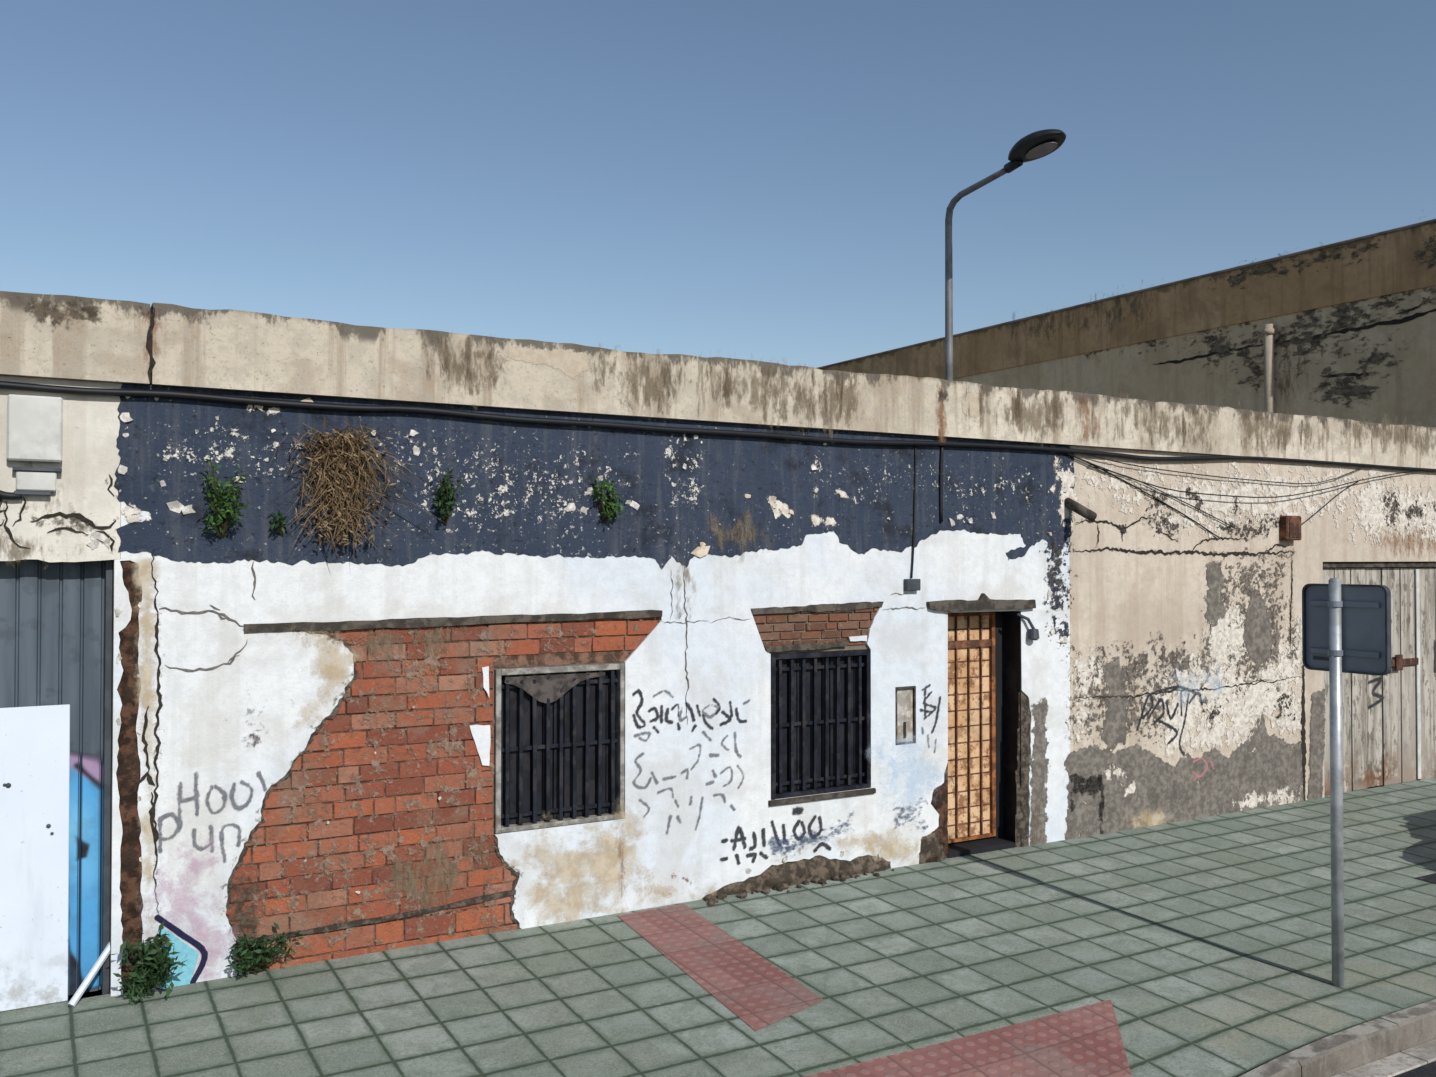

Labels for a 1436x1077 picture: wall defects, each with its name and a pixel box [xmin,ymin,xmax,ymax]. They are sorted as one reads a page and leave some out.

damp [25,301,101,328]
damp [707,368,858,433]
damp [1005,392,1064,436]
crack [1155,296,1436,365]
damp [1187,287,1436,407]
crack [1322,371,1368,379]
crack [0,474,117,551]
peeling [836,454,1436,846]
crack [138,554,256,918]
flaking render [223,617,661,974]
spalling [919,763,948,864]
flaking render [670,851,894,906]